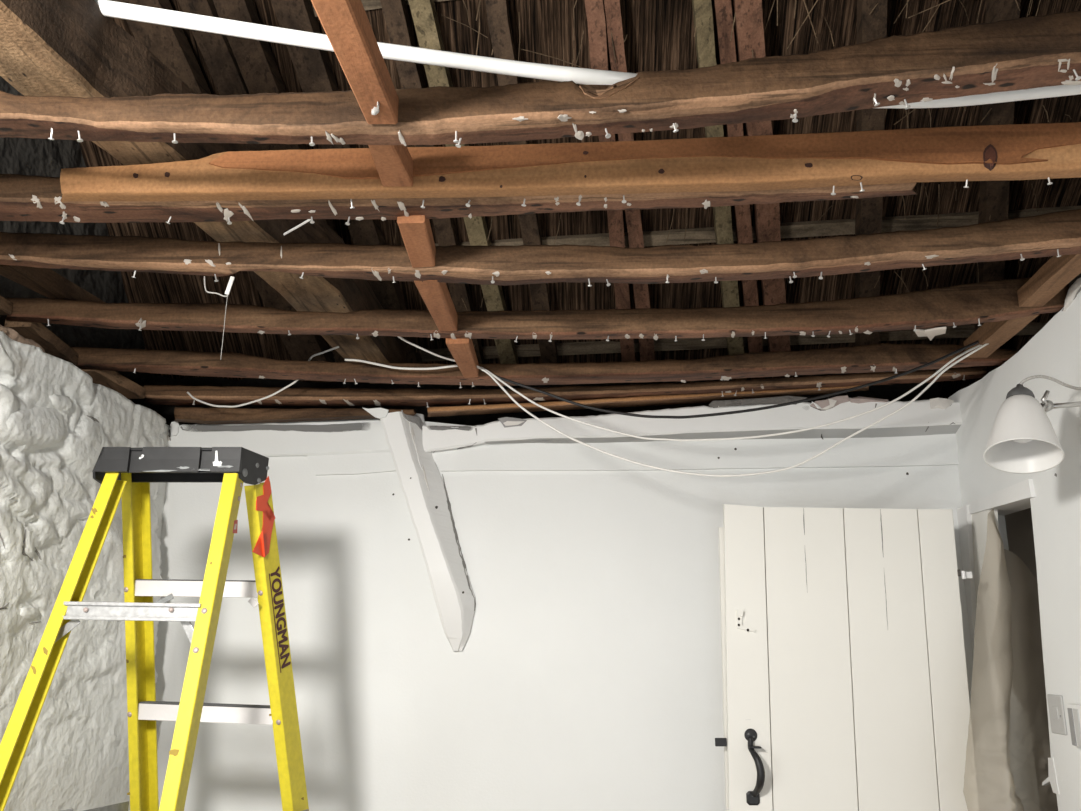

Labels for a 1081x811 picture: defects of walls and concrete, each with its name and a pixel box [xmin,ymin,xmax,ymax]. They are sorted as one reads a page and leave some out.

crack [0,529,42,561]